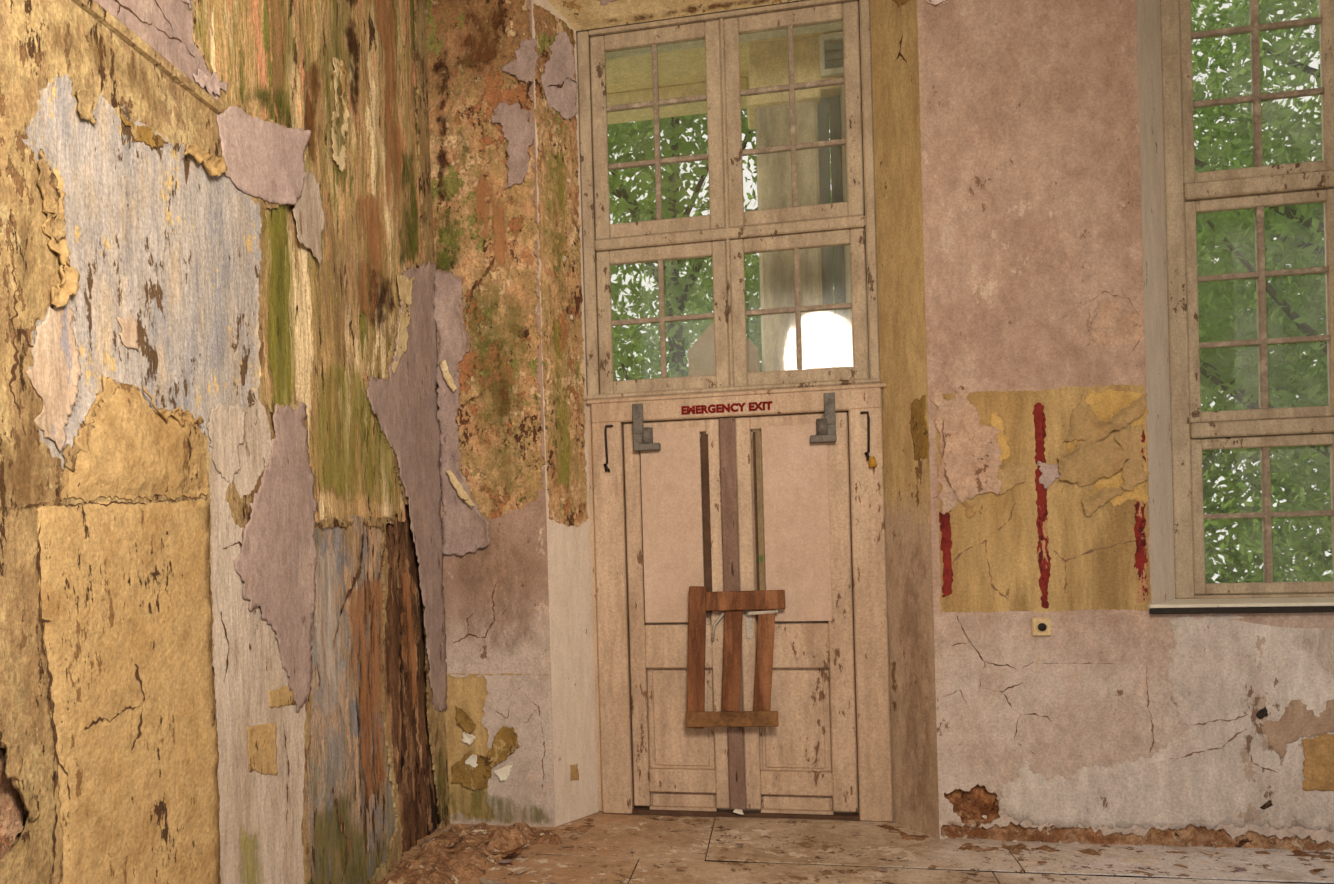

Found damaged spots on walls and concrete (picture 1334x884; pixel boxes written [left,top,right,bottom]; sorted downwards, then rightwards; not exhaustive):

flaking render [22,0,589,884]
peeling [910,384,1151,613]
flaking render [0,714,40,860]
peeling [940,614,1334,851]